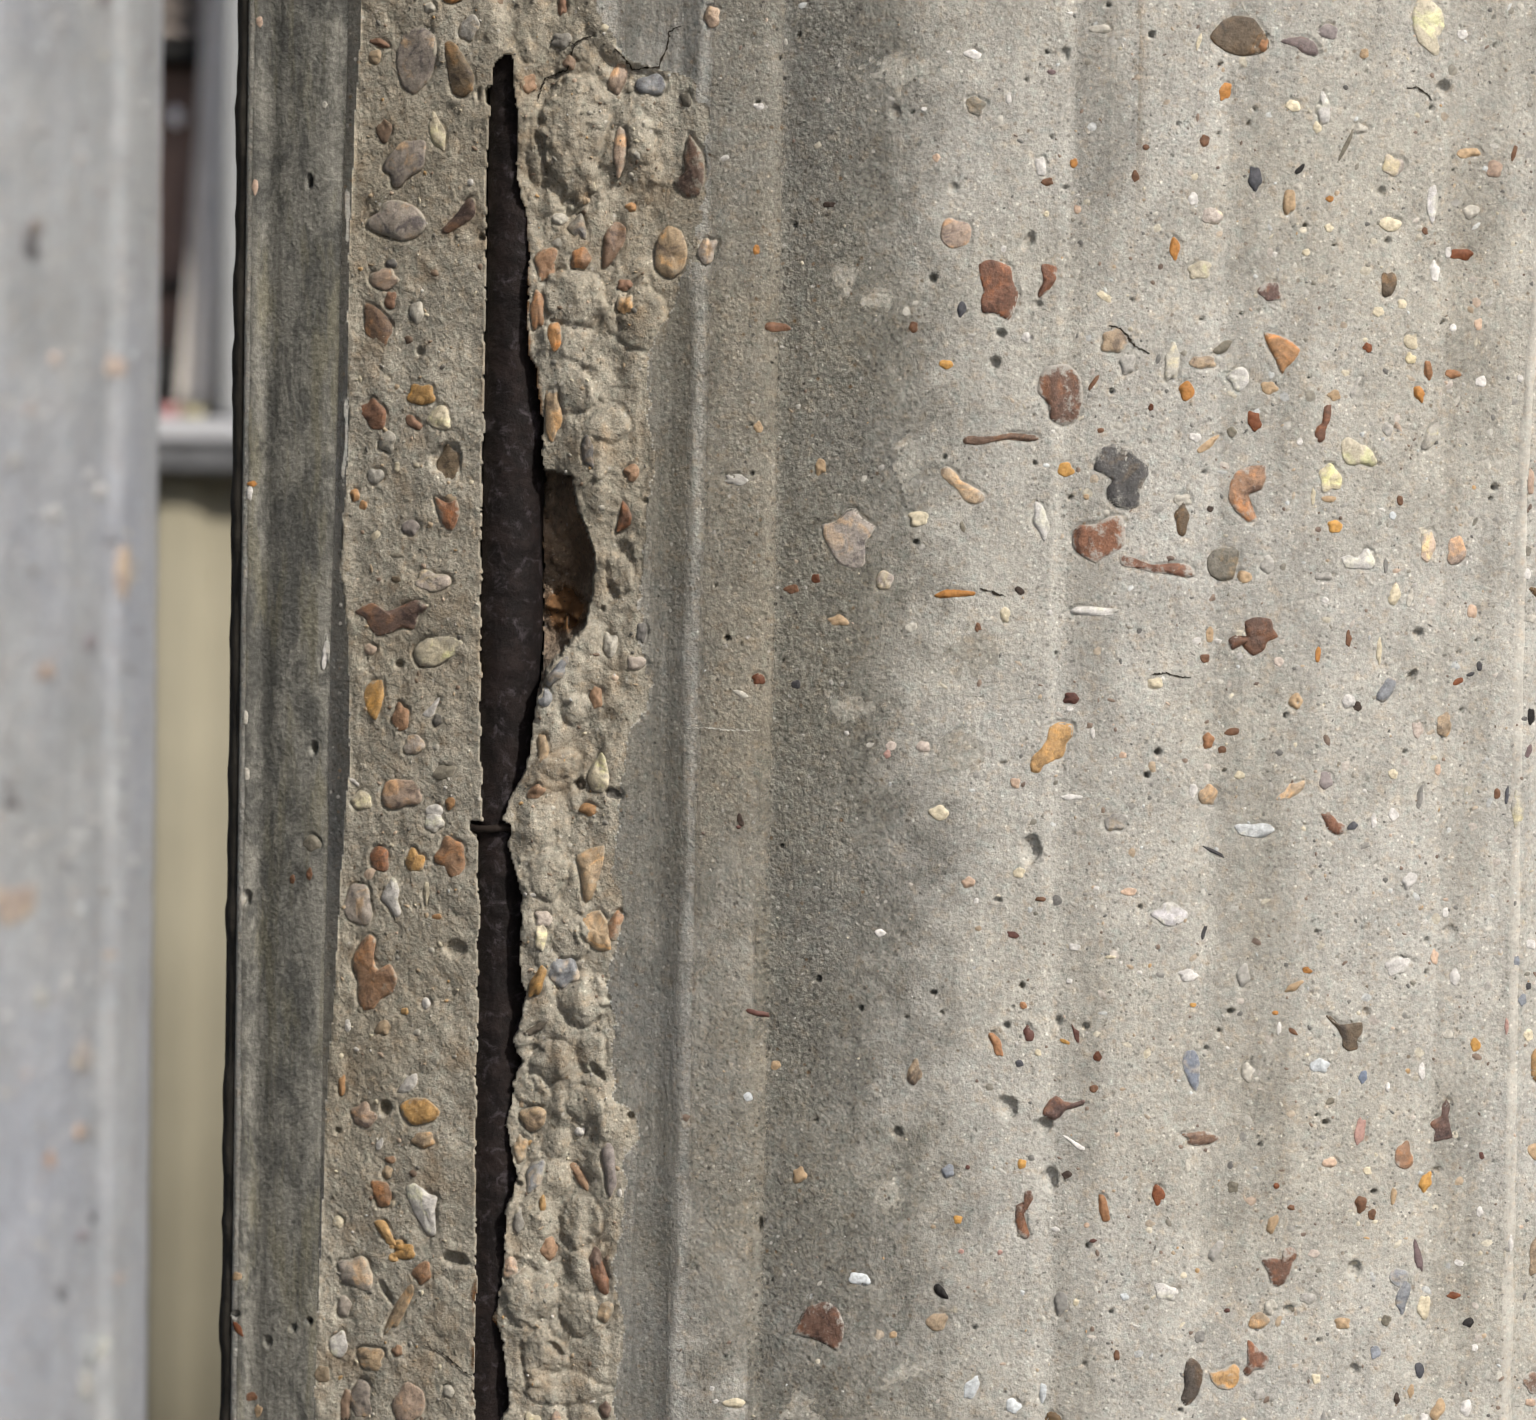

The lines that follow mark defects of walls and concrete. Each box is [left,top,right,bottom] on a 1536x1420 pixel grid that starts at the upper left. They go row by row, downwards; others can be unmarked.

spalling [704,6,720,28]
crack [538,26,681,99]
spalling [314,0,717,1420]